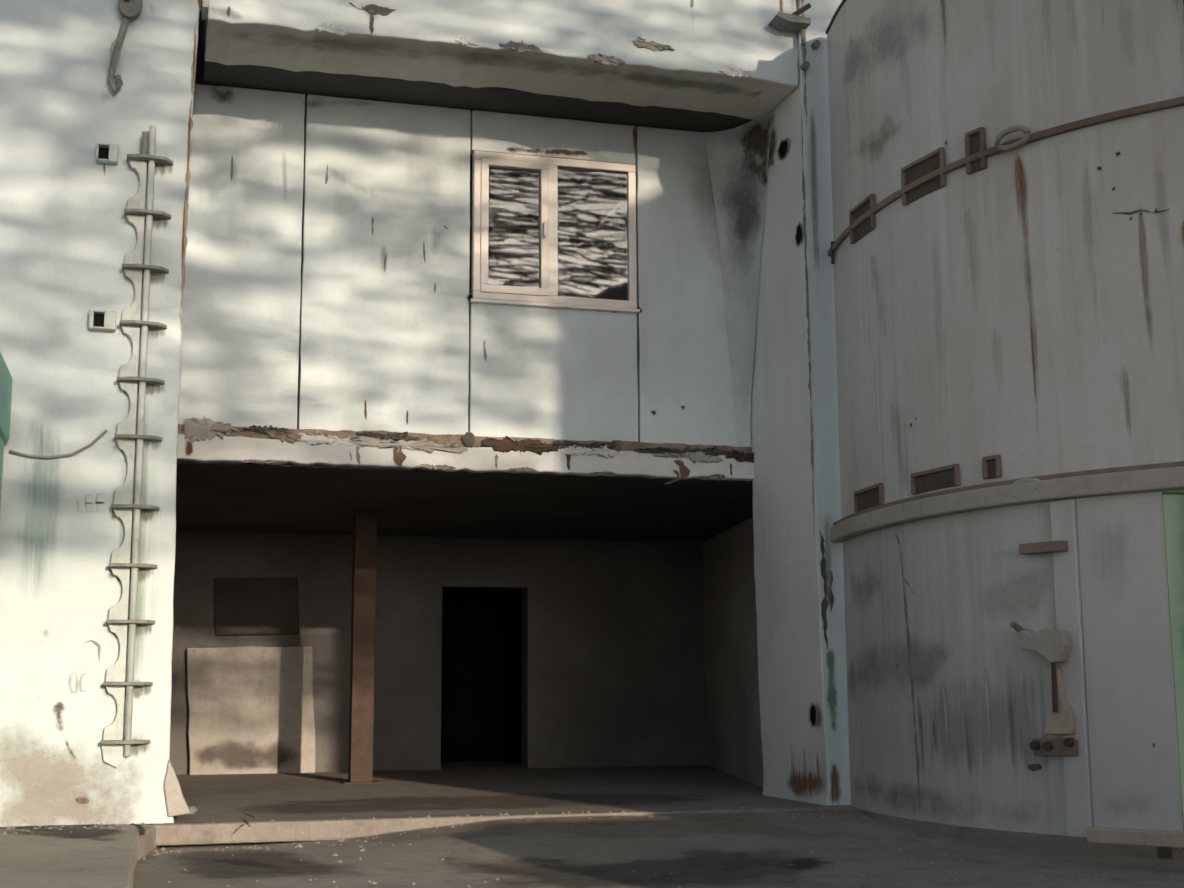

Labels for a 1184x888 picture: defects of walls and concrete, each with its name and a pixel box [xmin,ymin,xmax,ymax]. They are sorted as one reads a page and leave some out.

spalling [455,36,479,45]
spalling [498,40,544,53]
spalling [632,36,675,52]
spalling [587,53,626,67]
spalling [719,66,751,78]
rust [1015,158,1031,291]
spalling [183,415,620,476]
spalling [634,447,754,479]
peeling [820,533,834,649]